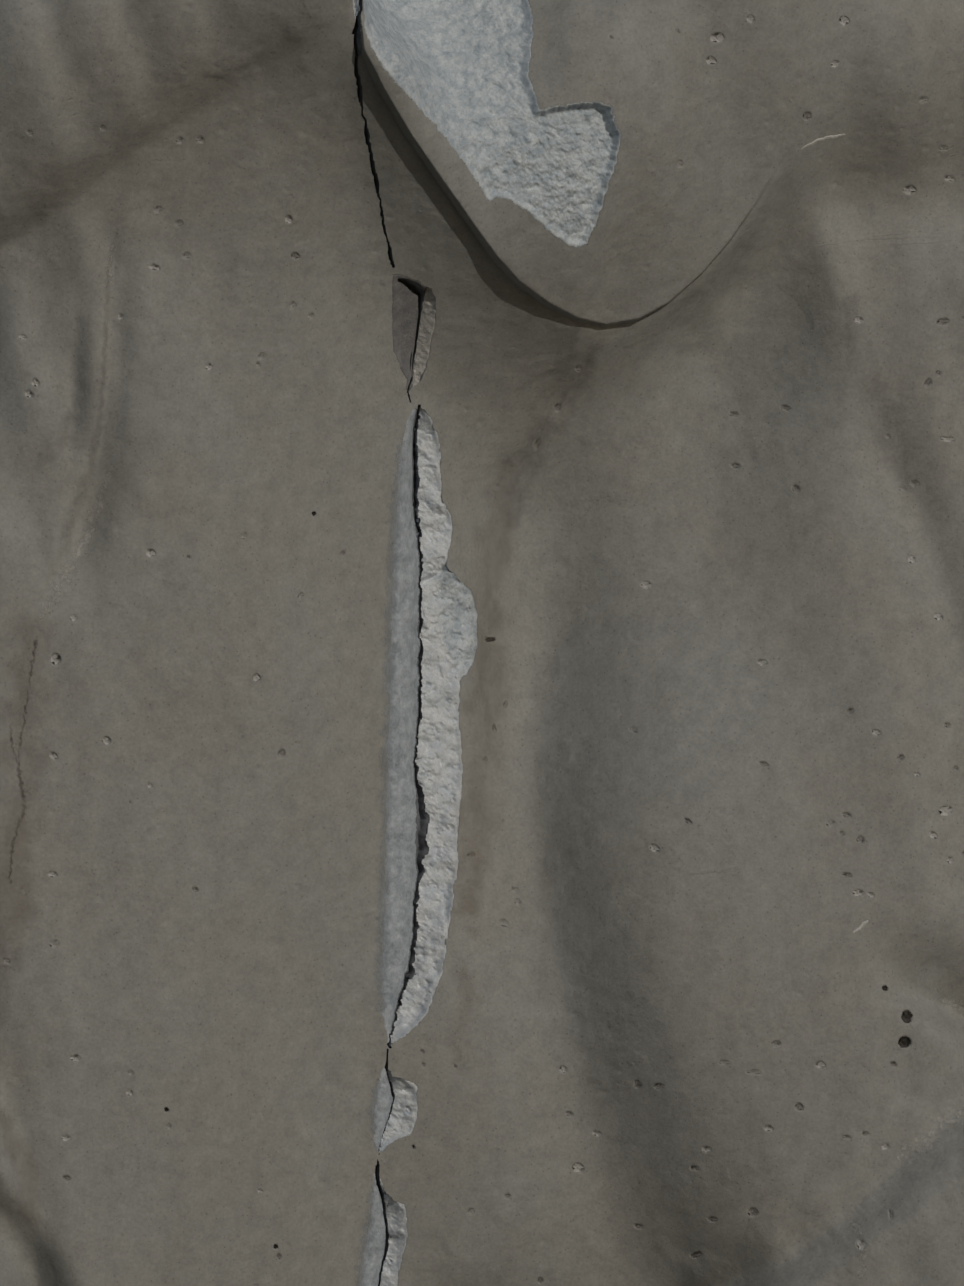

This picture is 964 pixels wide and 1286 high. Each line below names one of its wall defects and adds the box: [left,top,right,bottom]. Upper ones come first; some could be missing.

spalling [353,0,622,248]
spalling [392,274,436,393]
crack [352,0,430,1286]
spalling [377,405,496,1051]
spalling [359,1173,408,1286]
spalling [371,1067,418,1153]